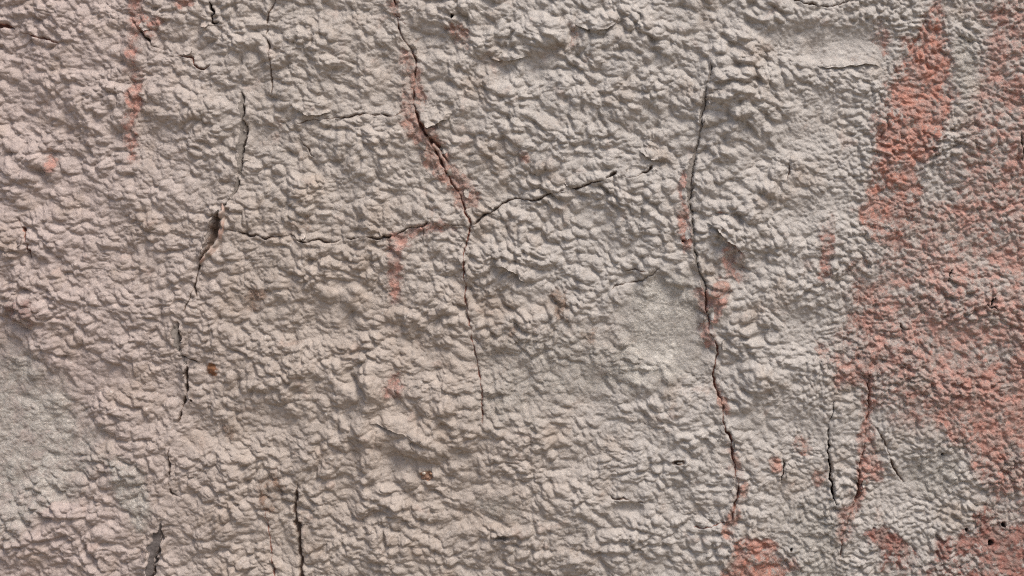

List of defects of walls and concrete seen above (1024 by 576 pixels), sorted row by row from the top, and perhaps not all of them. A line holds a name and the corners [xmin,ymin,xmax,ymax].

crack [135,2,217,70]
crack [170,263,205,422]
crack [220,0,659,424]
crack [681,61,741,529]
crack [822,374,903,556]
peeling [815,0,1024,576]